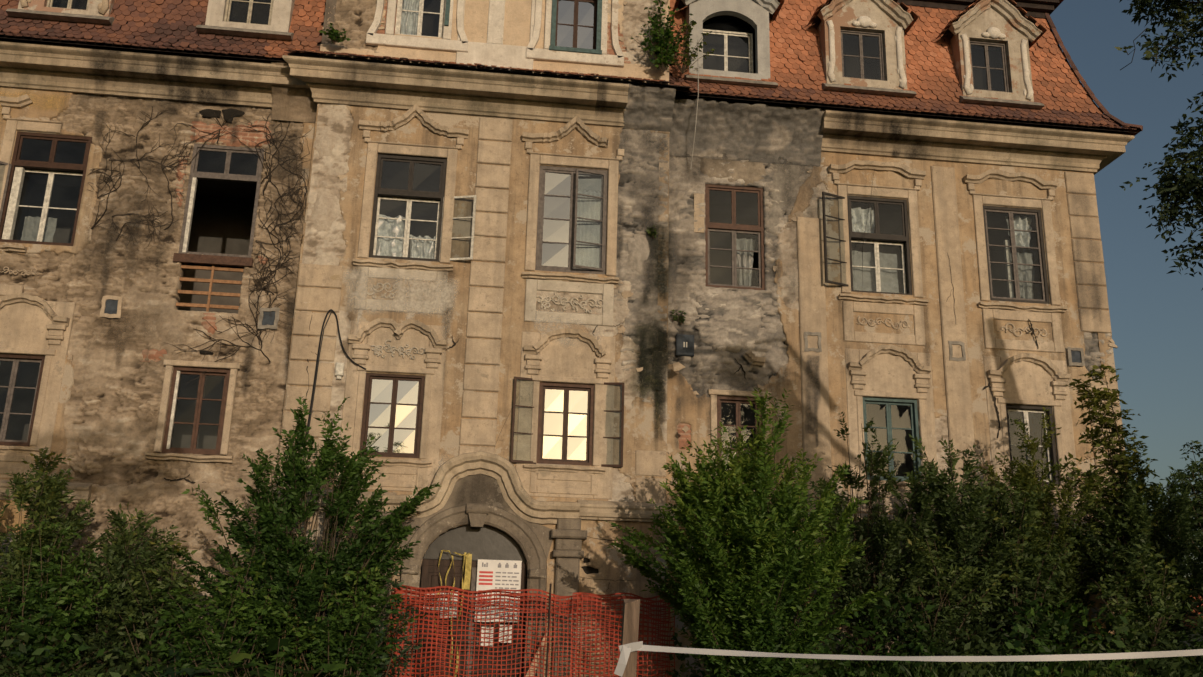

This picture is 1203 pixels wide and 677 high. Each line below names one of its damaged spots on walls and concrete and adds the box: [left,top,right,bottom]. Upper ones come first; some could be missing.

flaking render [190,108,273,147]
peeling [302,103,354,266]
leakage [641,182,676,304]
peeling [772,157,834,311]
flaking render [200,313,217,355]
leakage [637,321,680,419]